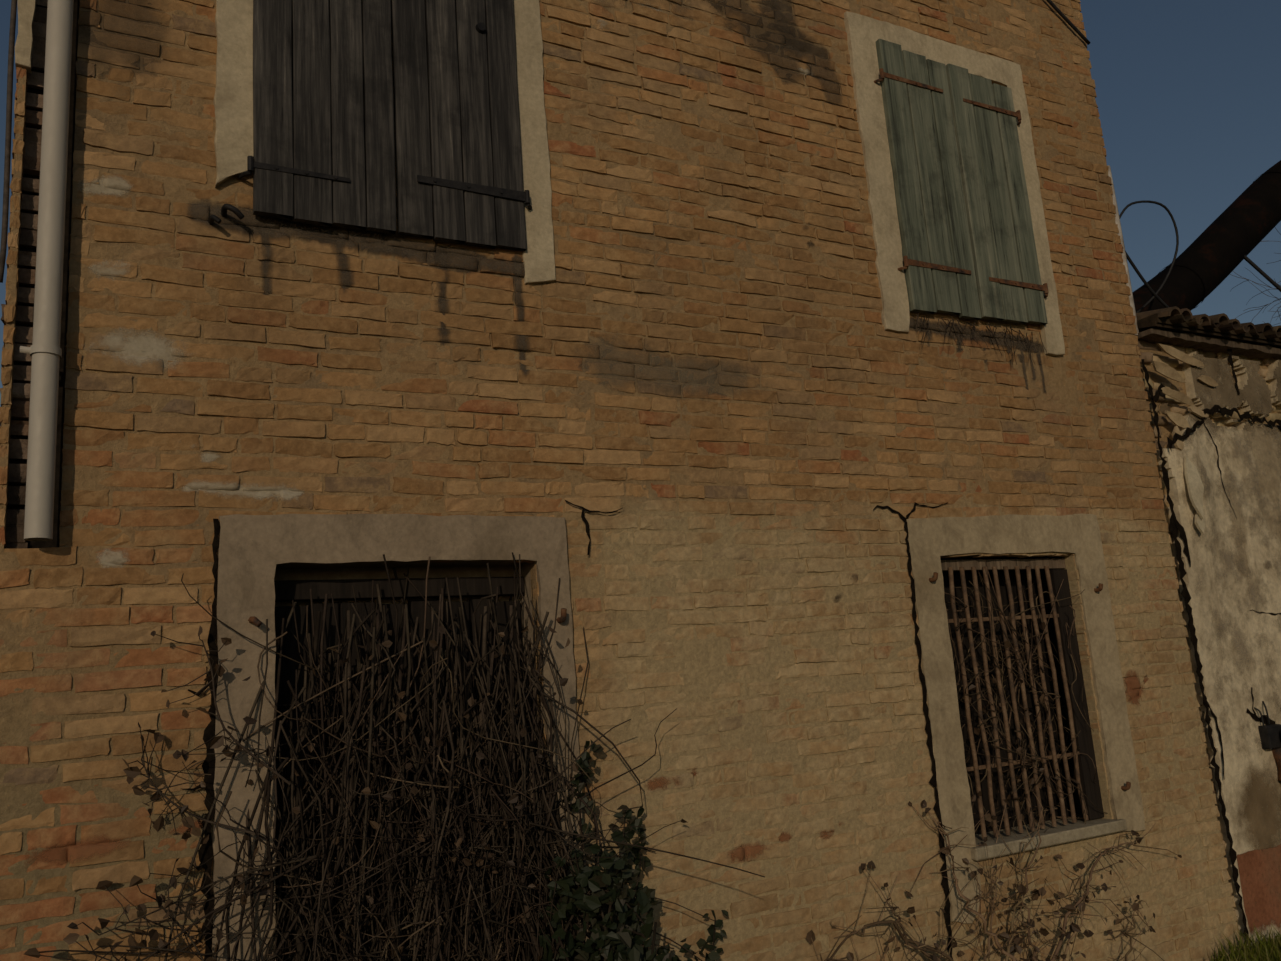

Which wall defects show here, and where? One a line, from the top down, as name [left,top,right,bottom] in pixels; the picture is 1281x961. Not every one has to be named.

damp [188,202,528,374]
spalling [1152,343,1281,534]